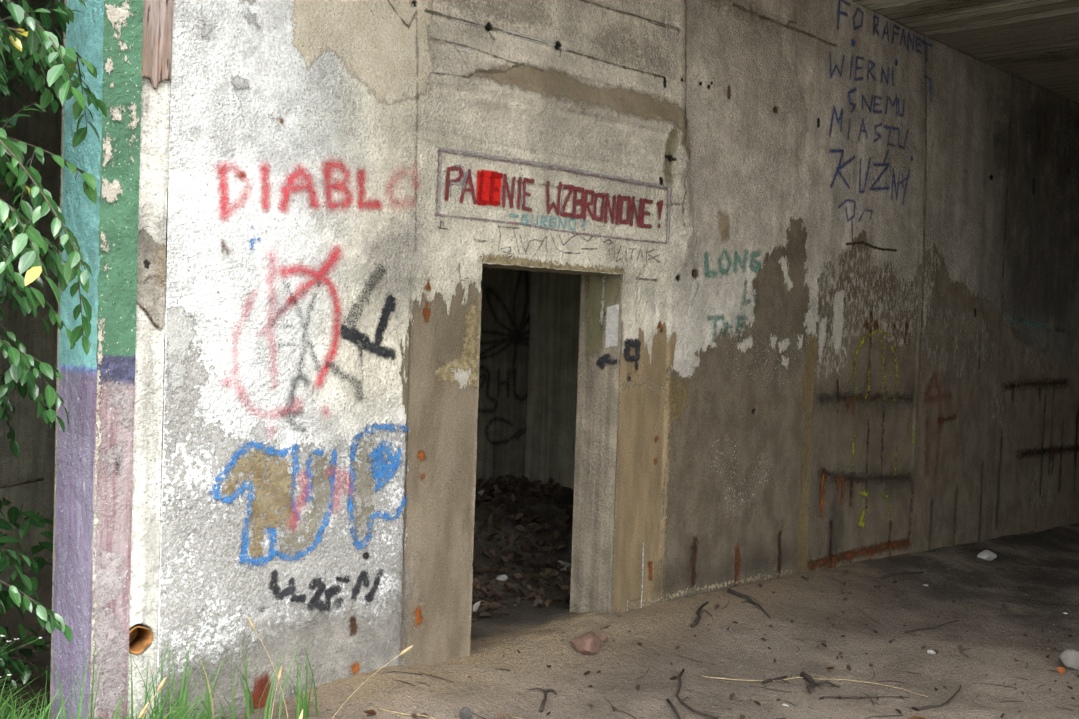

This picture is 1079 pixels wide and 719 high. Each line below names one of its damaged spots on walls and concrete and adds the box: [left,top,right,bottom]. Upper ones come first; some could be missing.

peeling [105,0,134,88]
peeling [291,0,435,105]
peeling [102,95,141,208]
peeling [100,230,110,272]
peeling [611,216,1079,613]
peeling [136,229,482,719]
rust [808,413,914,571]
rust [690,537,698,586]